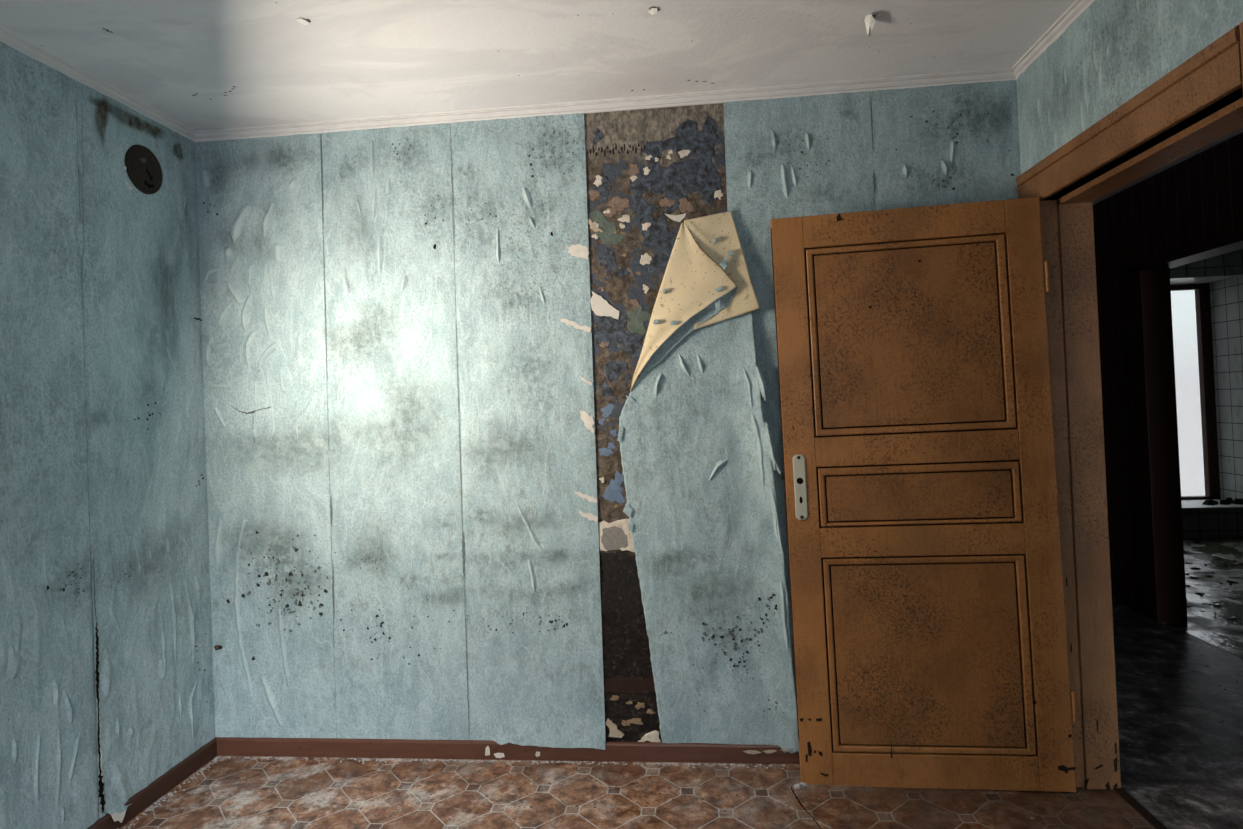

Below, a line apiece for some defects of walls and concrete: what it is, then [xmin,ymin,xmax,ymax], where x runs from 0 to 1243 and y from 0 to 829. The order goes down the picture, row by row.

leakage [96,101,160,137]
spalling [584,103,727,742]
mould [226,535,328,632]
crack [93,556,105,813]
mould [338,604,468,665]
mould [689,594,777,686]